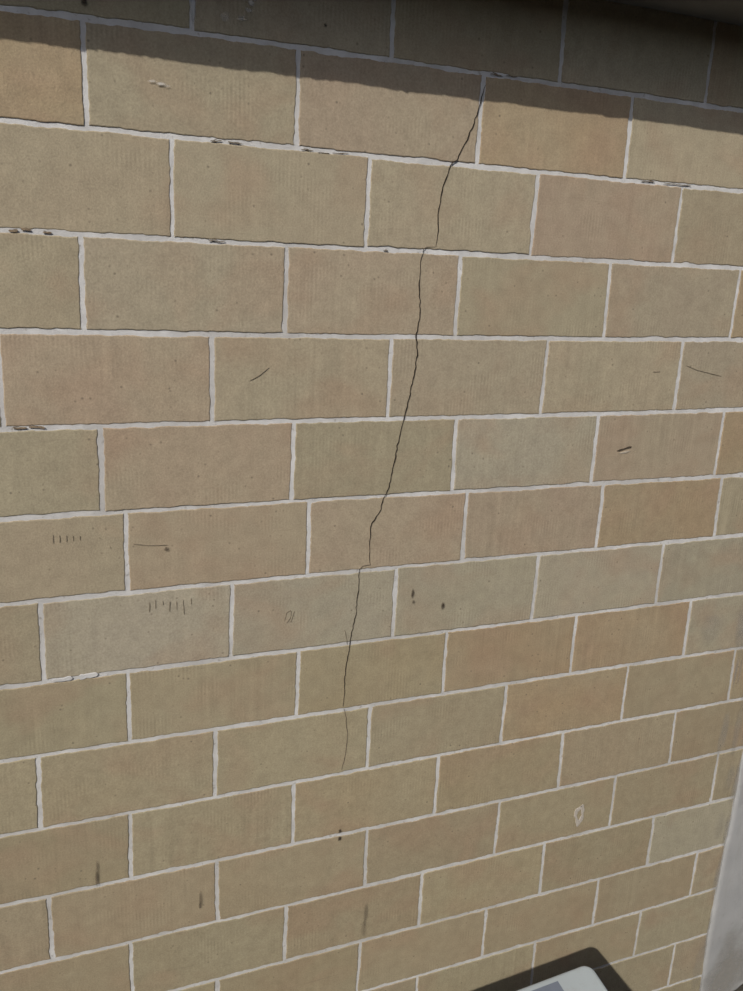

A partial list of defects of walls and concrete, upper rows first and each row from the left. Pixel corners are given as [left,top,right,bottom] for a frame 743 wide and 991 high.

crack [342,87,485,767]